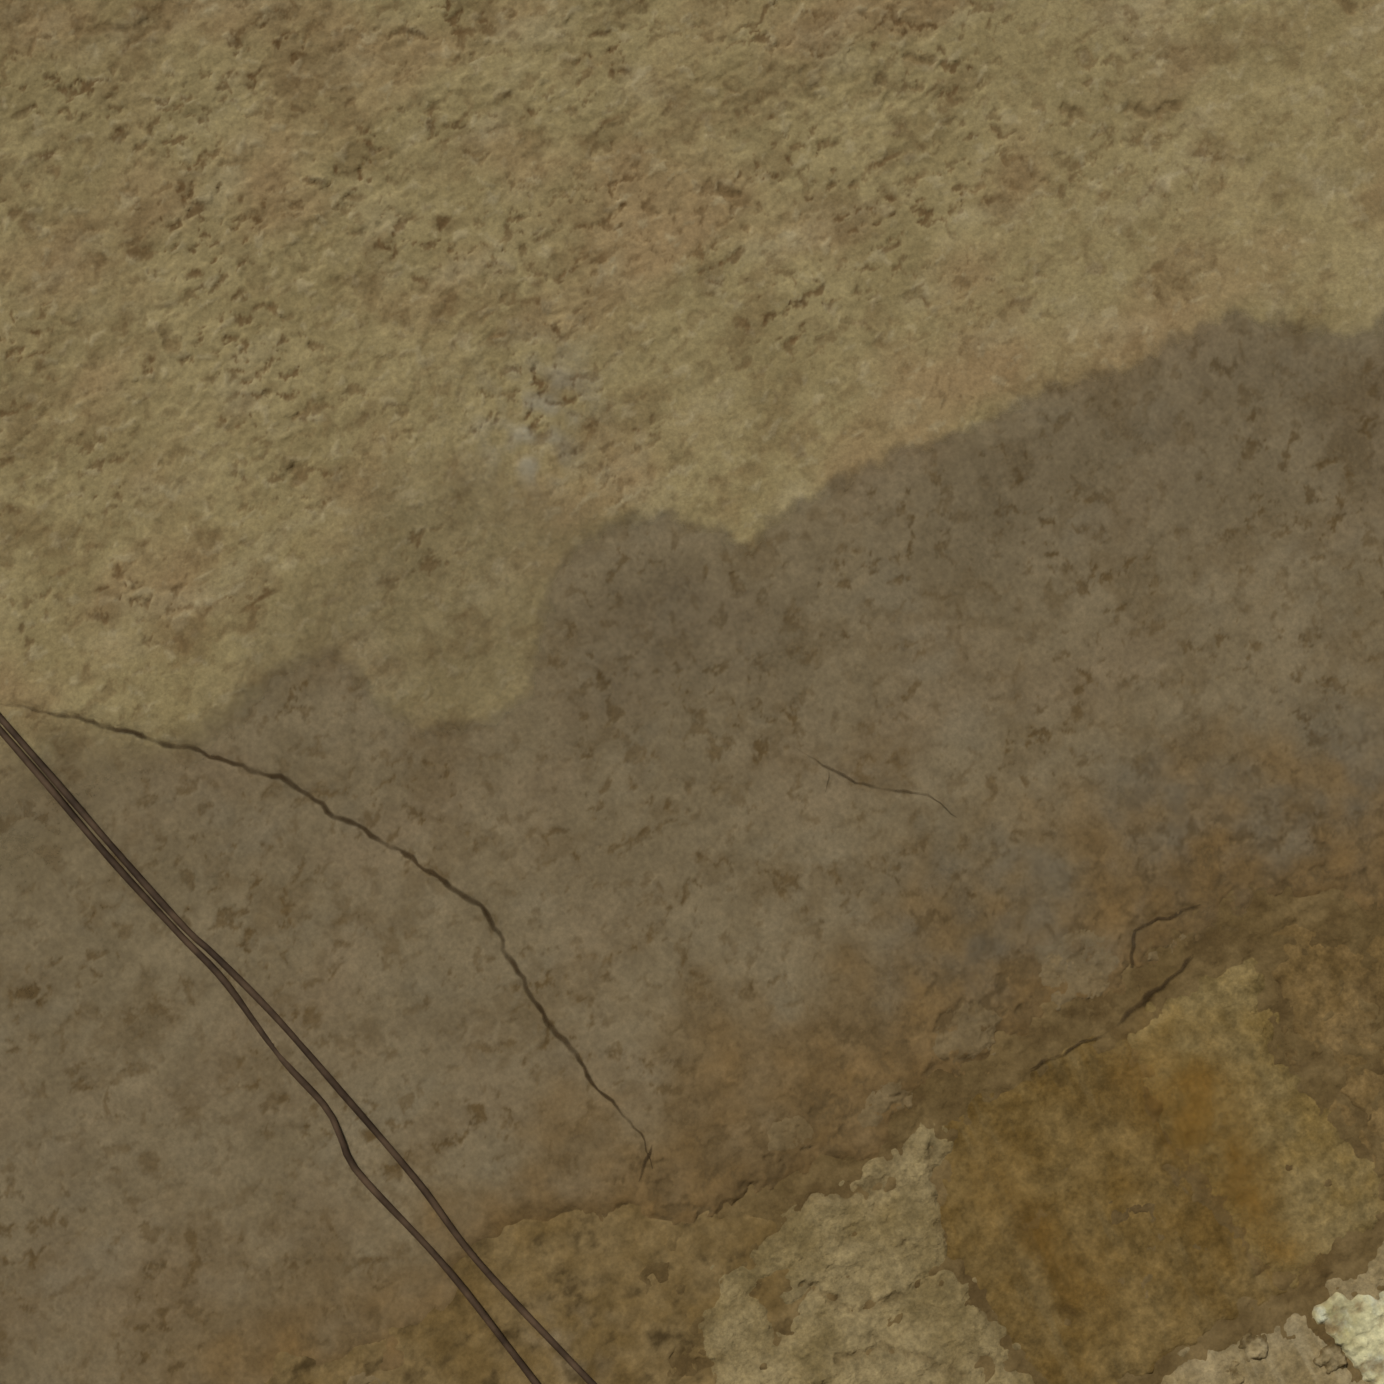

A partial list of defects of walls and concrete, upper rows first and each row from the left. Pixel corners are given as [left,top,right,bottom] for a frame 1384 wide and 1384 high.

crack [80,717,493,926]
crack [509,958,653,1169]
damp [0,312,1384,1384]
flaking render [264,884,1384,1384]